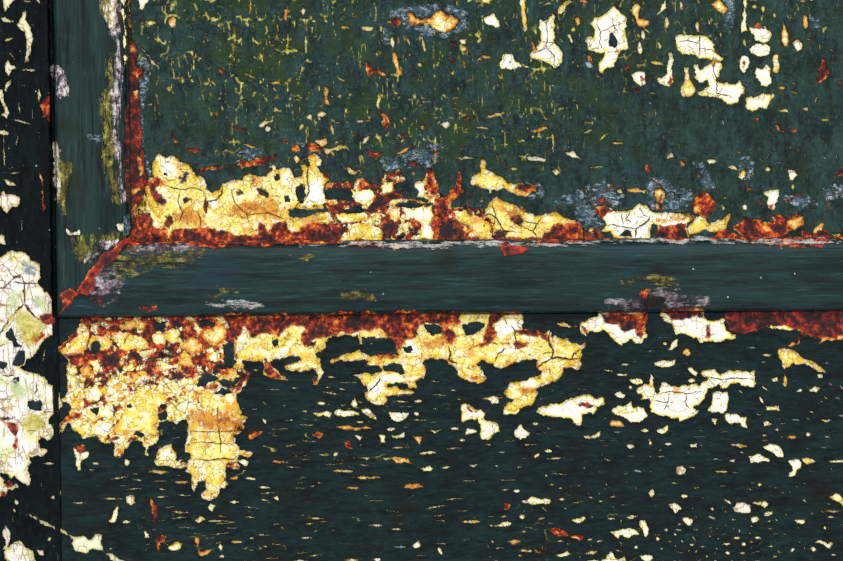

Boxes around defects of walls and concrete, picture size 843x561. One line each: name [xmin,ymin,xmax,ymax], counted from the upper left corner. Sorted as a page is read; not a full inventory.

peeling [575,0,669,74]
peeling [651,0,785,111]
corrosion [26,0,403,345]
peeling [132,124,731,241]
corrosion [425,167,642,256]
corrosion [706,200,843,248]
crack [0,270,38,346]
corrosion [225,305,463,360]
corrosion [600,310,648,338]
peeling [0,233,756,526]
crack [190,407,243,461]
peeling [29,514,124,561]